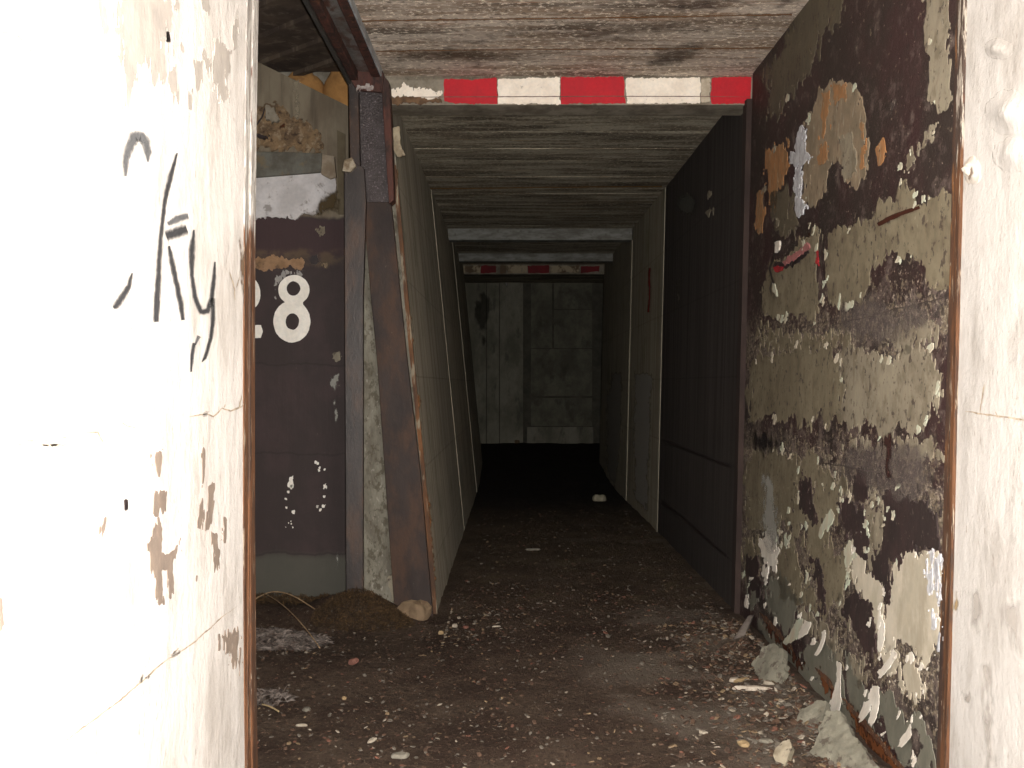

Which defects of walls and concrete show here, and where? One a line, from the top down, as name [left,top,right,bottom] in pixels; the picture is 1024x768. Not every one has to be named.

peeling [112,0,239,112]
peeling [337,130,345,214]
peeling [255,254,305,299]
peeling [745,0,953,464]
crack [65,607,236,741]
peeling [150,449,163,477]
peeling [147,490,182,606]
peeling [197,447,227,573]
crack [191,396,244,417]
peeling [218,626,243,676]
rust [759,612,904,768]
peeling [741,442,943,768]